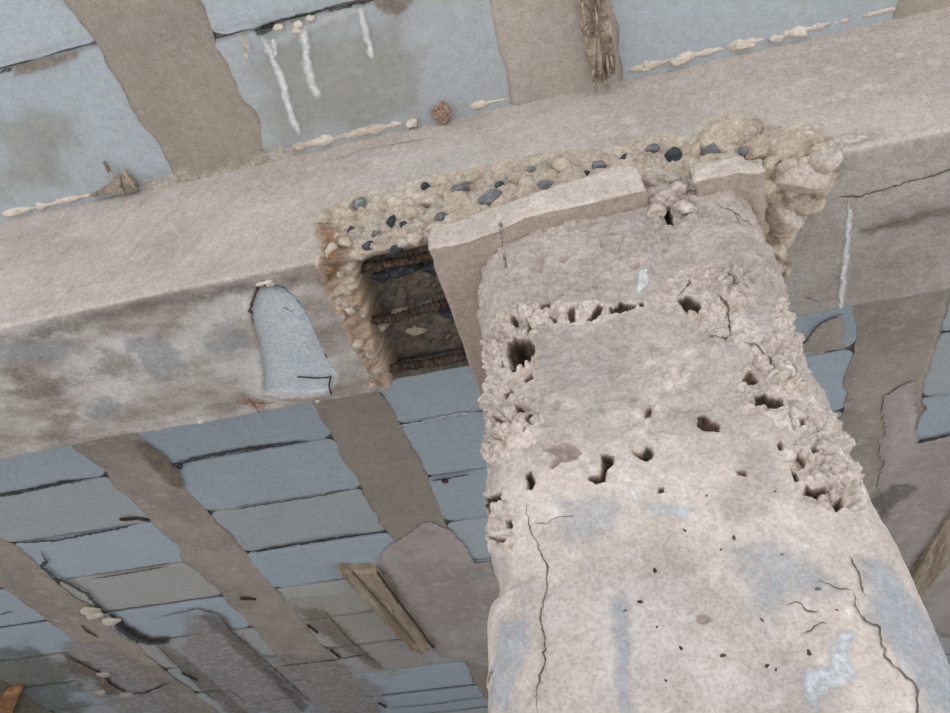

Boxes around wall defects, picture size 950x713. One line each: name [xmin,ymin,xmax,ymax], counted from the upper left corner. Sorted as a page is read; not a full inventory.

leakage [263,9,409,133]
crack [836,169,950,199]
peeling [248,280,336,404]
rust [360,250,433,274]
rust [370,299,450,324]
rust [389,352,468,374]
spalling [313,112,843,393]
efflorescence [837,204,853,310]
crack [525,509,573,711]
crack [788,601,825,633]
crack [818,558,919,713]